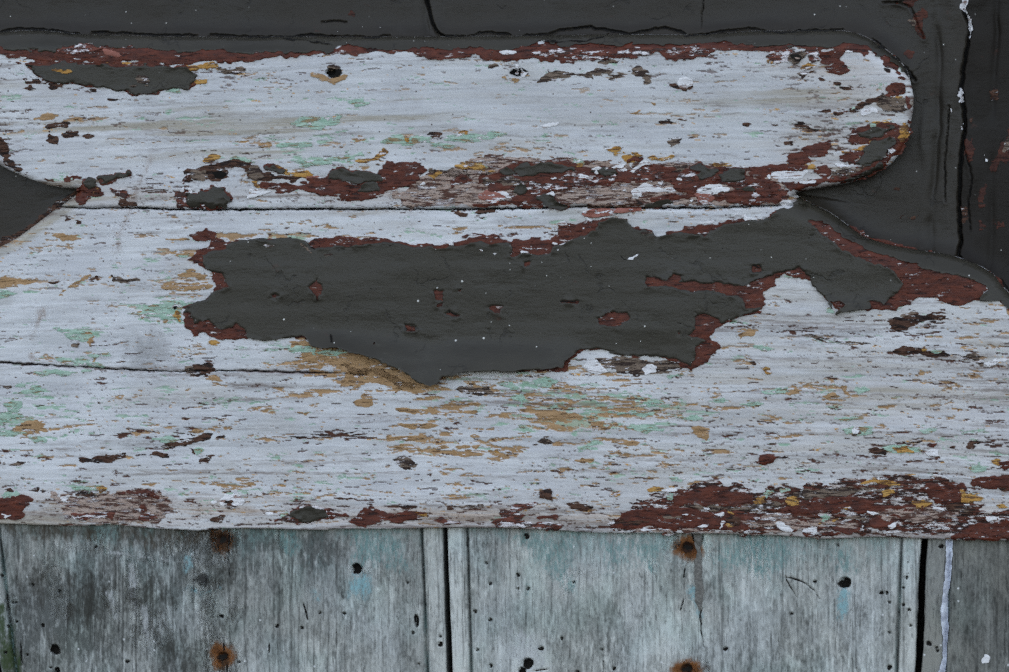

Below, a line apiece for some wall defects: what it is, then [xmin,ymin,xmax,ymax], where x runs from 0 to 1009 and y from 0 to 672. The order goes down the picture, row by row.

crack [425,0,844,42]
crack [872,39,916,81]
peeling [0,30,1009,470]
crack [0,338,356,375]
peeling [0,485,174,525]
peeling [265,497,484,528]
peeling [491,502,564,531]
peeling [566,501,593,512]
peeling [607,458,1009,541]
corrosion [672,535,703,560]
corrosion [210,642,235,669]
corrosion [670,659,706,672]